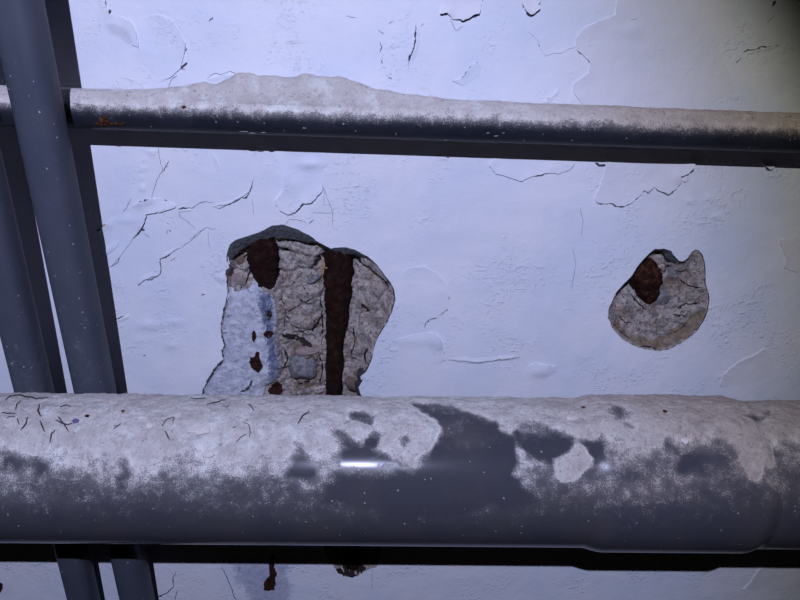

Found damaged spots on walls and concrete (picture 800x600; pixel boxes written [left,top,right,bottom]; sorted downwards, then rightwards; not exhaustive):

crack [408,24,422,68]
peeling [573,0,740,110]
crack [101,150,254,286]
spalling [204,224,395,396]
spalling [608,249,709,351]
rust [249,352,263,373]
rust [268,381,283,395]
rust [264,554,277,591]
spalling [323,546,381,578]